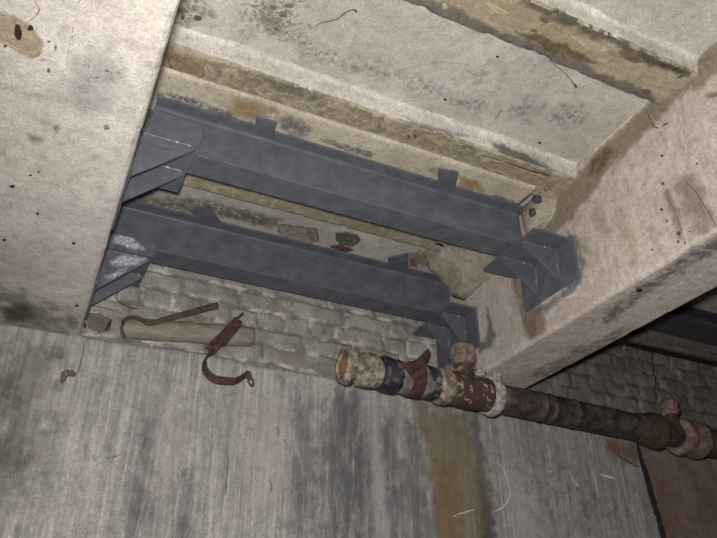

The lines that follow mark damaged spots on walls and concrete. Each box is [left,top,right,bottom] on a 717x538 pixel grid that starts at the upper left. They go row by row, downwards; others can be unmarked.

leakage [406,0,717,232]